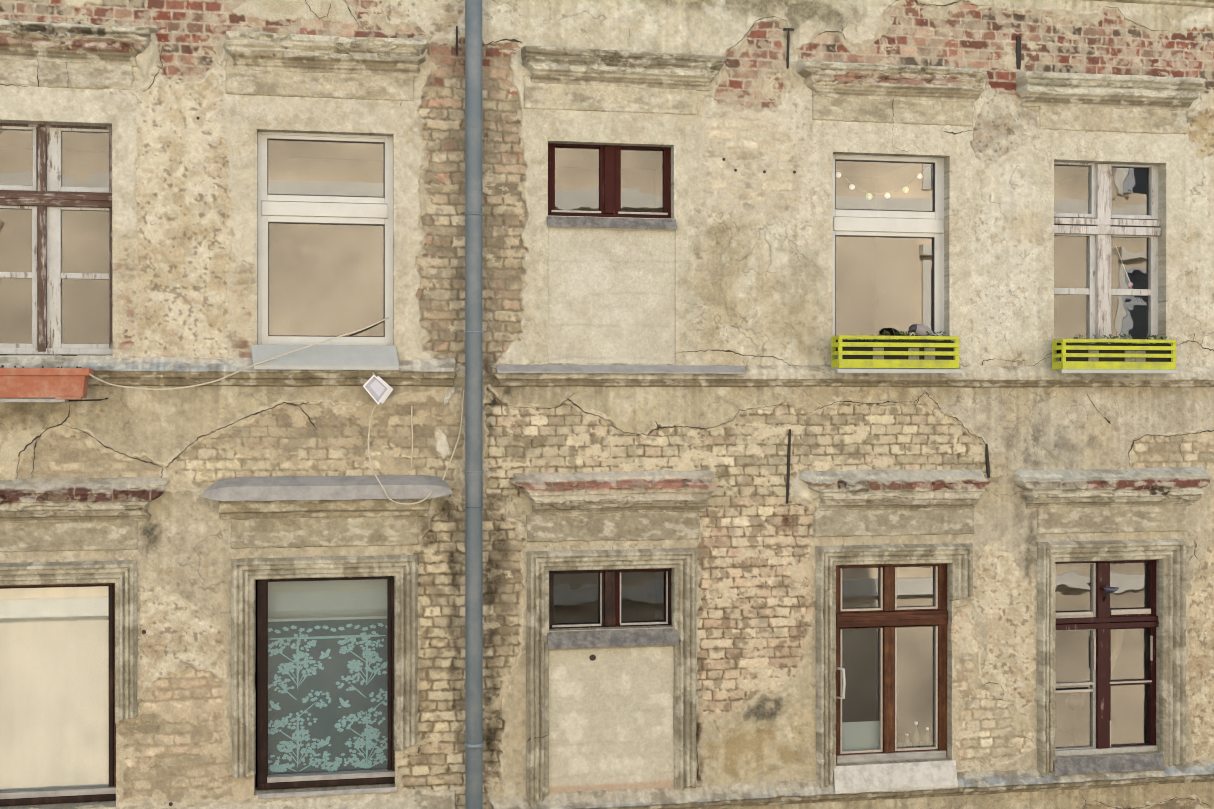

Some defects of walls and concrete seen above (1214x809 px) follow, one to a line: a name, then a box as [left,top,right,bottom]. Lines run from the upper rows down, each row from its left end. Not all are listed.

flaking render [0,0,465,367]
flaking render [482,41,529,374]
flaking render [702,0,1214,222]
crack [17,402,316,478]
flaking render [15,390,465,809]
flaking render [483,389,993,809]